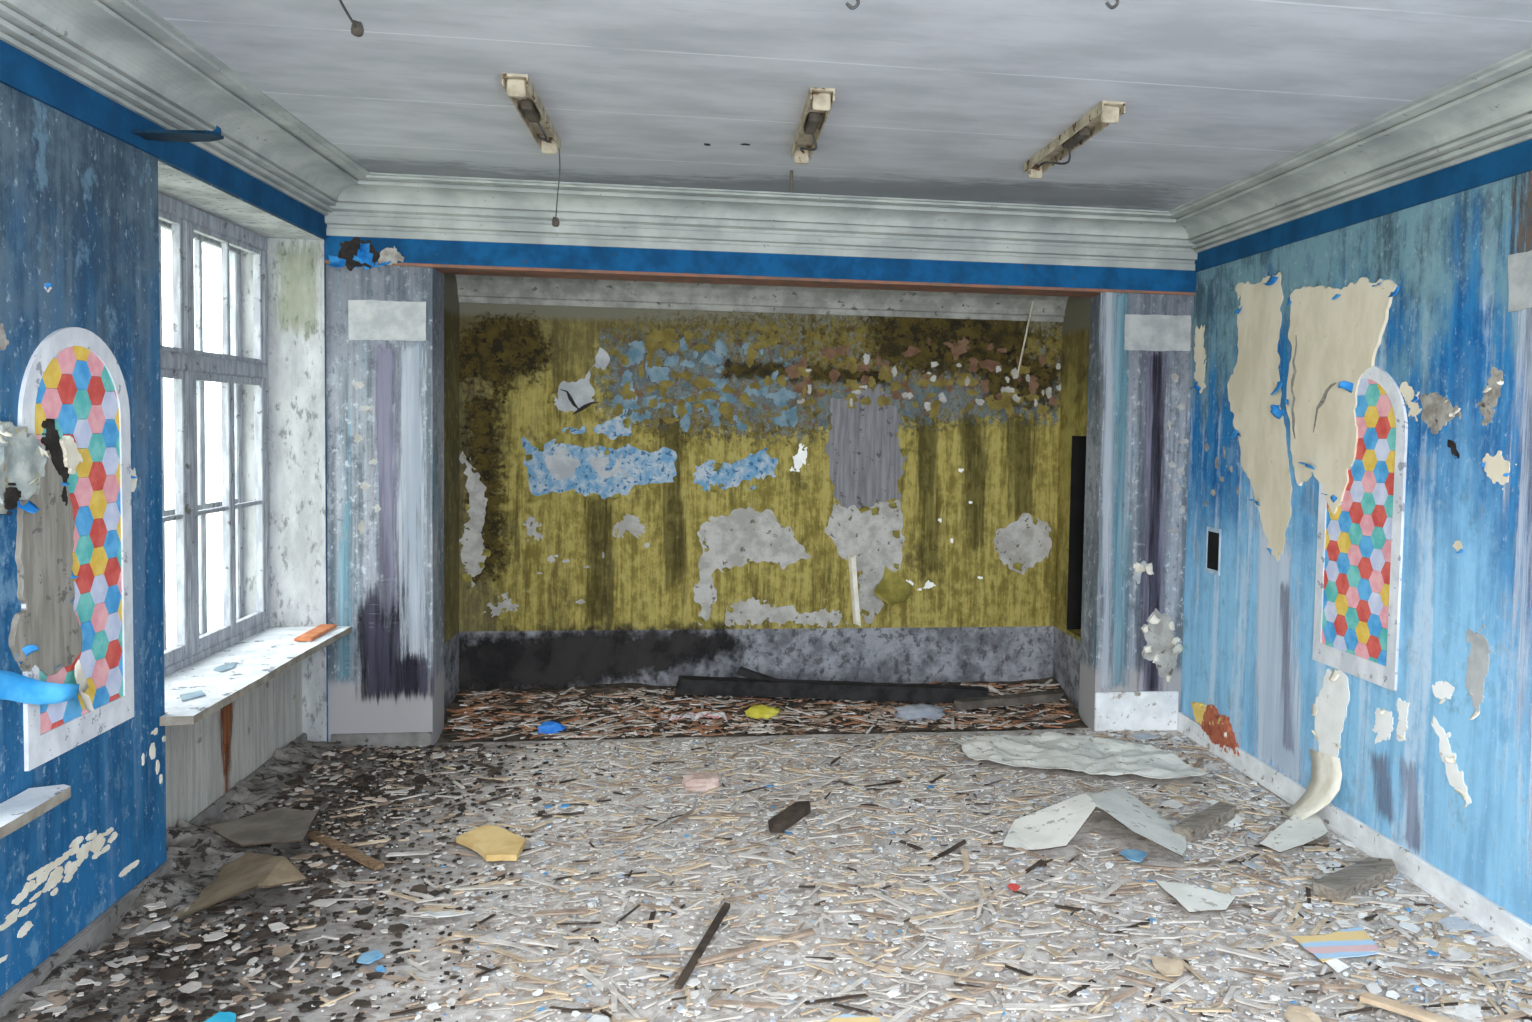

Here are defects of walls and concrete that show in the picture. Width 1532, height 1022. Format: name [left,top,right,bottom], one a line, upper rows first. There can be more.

peeling [0,450,94,712]
damp [339,342,434,704]
damp [459,311,552,588]
damp [459,624,746,691]
peeling [522,312,1062,629]
peeling [1124,272,1400,561]
peeling [1285,668,1350,820]
peeling [1372,698,1410,744]
spalling [1399,367,1505,459]
peeling [1431,624,1491,808]
peeling [1481,451,1517,490]
peeling [0,827,118,938]